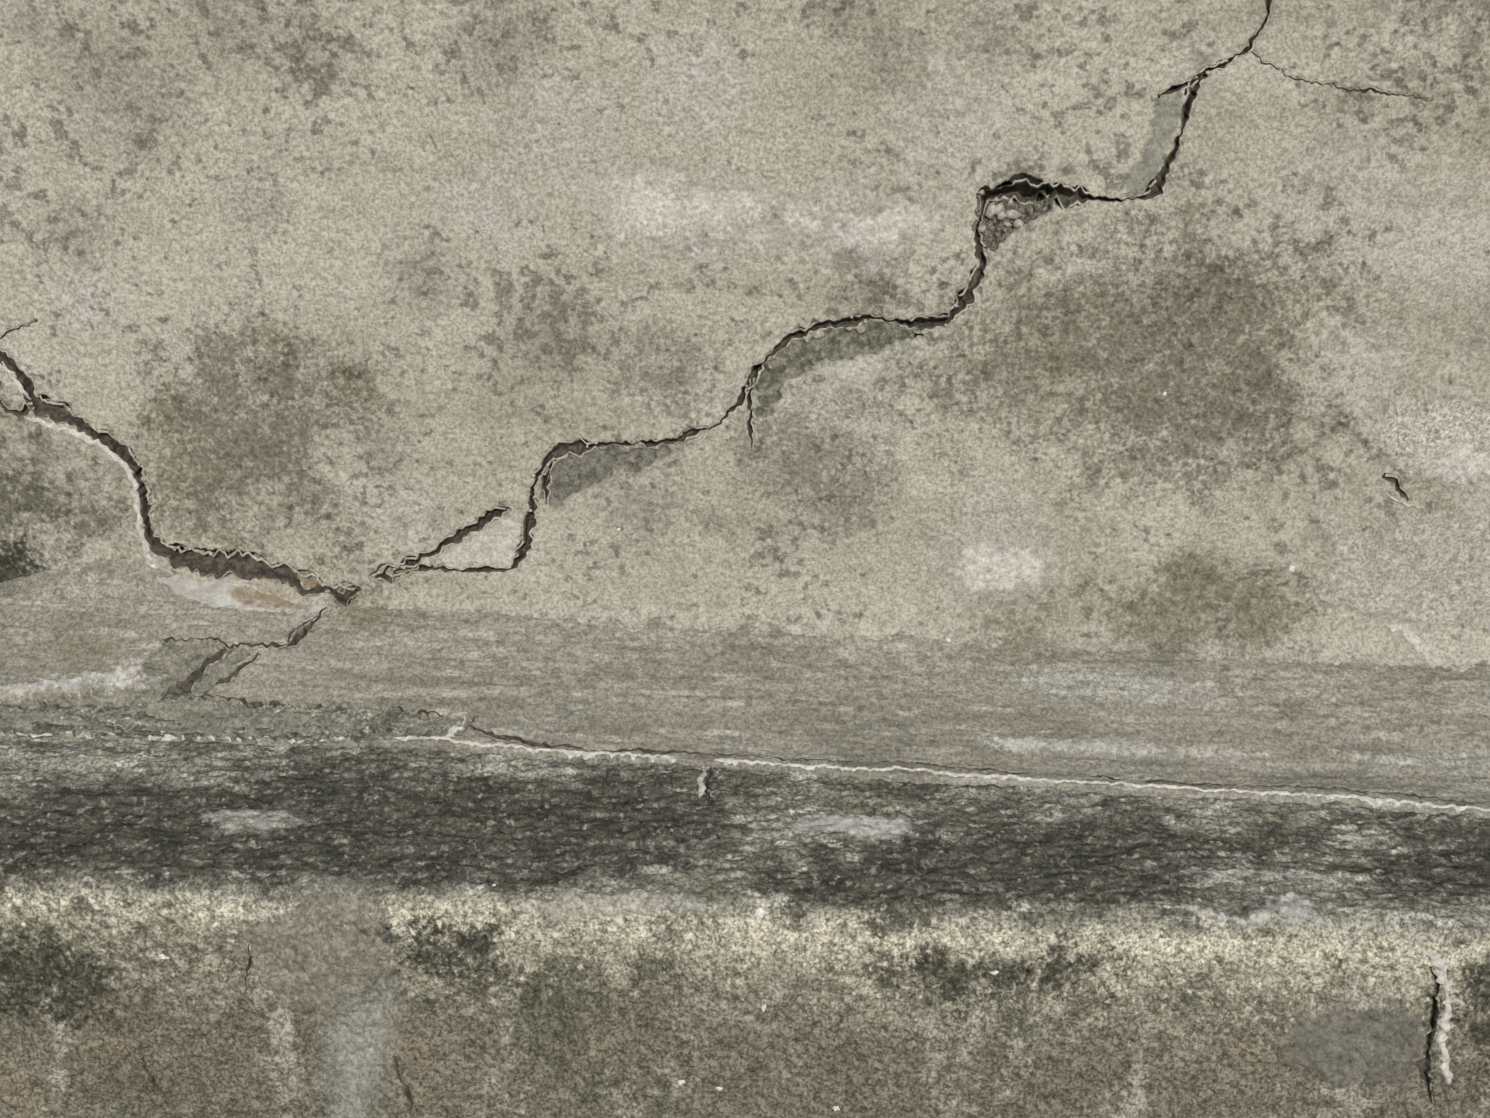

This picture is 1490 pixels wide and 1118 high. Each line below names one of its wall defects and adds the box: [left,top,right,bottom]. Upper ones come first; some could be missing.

crack [0,0,1490,813]
spalling [0,643,466,745]
damp [0,926,121,1033]
damp [322,965,402,1118]
damp [0,749,748,995]
damp [744,809,1330,1011]
damp [1356,821,1490,901]
damp [1438,955,1490,1085]